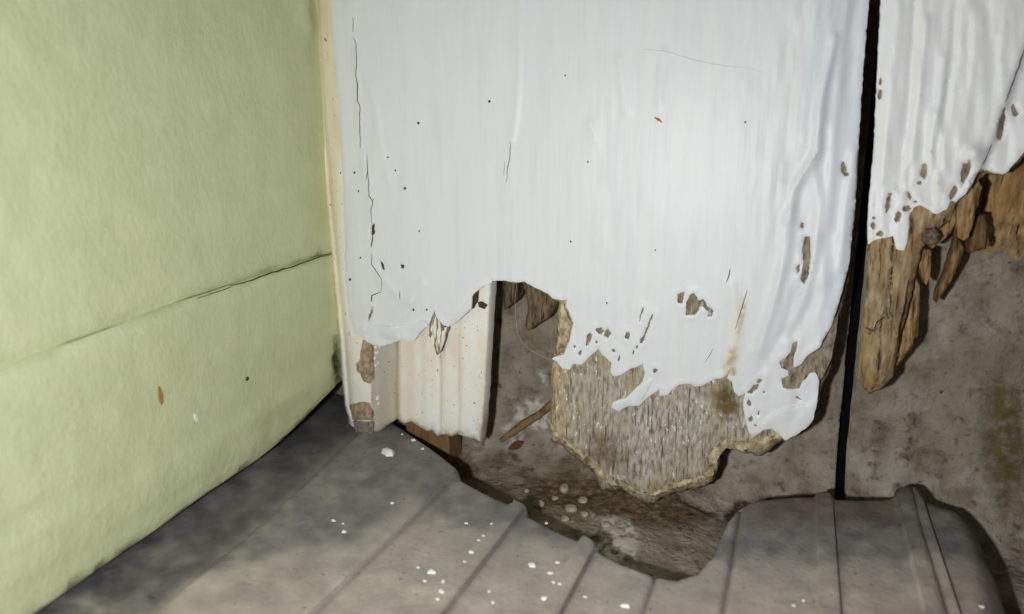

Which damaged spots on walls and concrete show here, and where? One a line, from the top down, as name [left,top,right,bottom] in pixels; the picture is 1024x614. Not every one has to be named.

crack [353,38,400,302]
peeling [870,164,927,237]
peeling [950,160,971,200]
crack [199,255,329,298]
peeling [450,278,492,324]
peeling [677,292,713,316]
peeling [356,309,429,384]
spalling [555,303,611,355]
peeling [612,369,658,411]
peeling [747,313,838,440]
spalling [349,402,375,433]